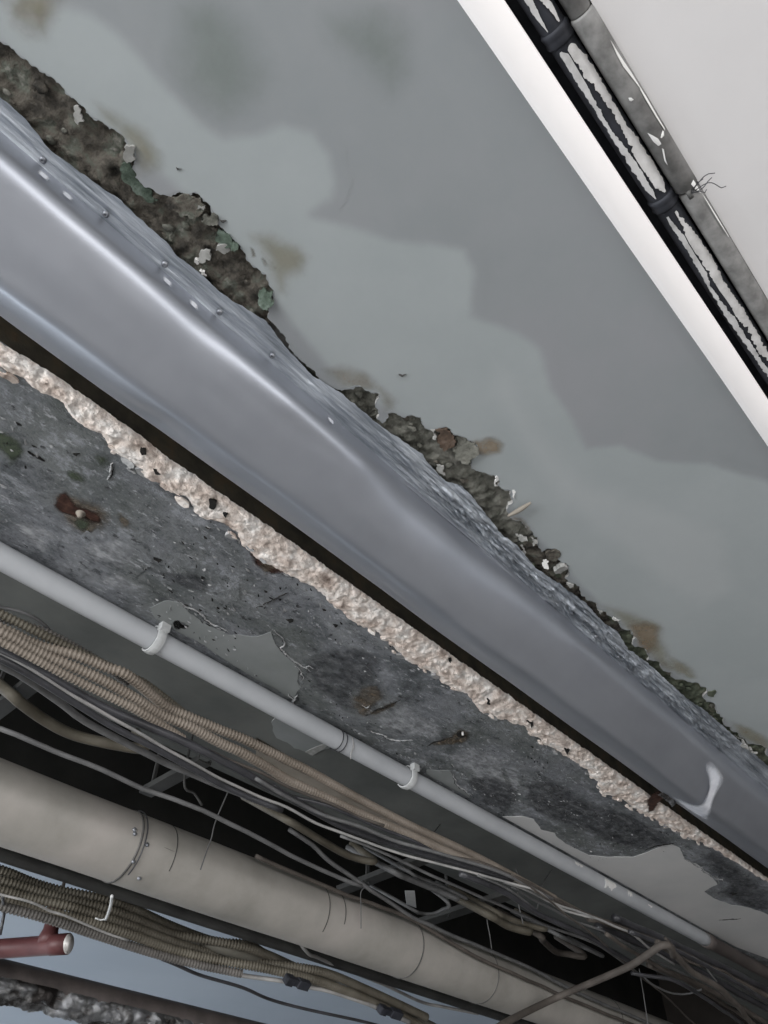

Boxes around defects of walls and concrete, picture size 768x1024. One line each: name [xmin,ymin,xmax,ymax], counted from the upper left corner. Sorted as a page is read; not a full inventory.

flaking render [0,42,274,325]
peeling [560,41,667,199]
peeling [666,211,768,377]
corrosion [54,493,105,532]
water stain [476,439,499,454]
flaking render [0,342,768,959]